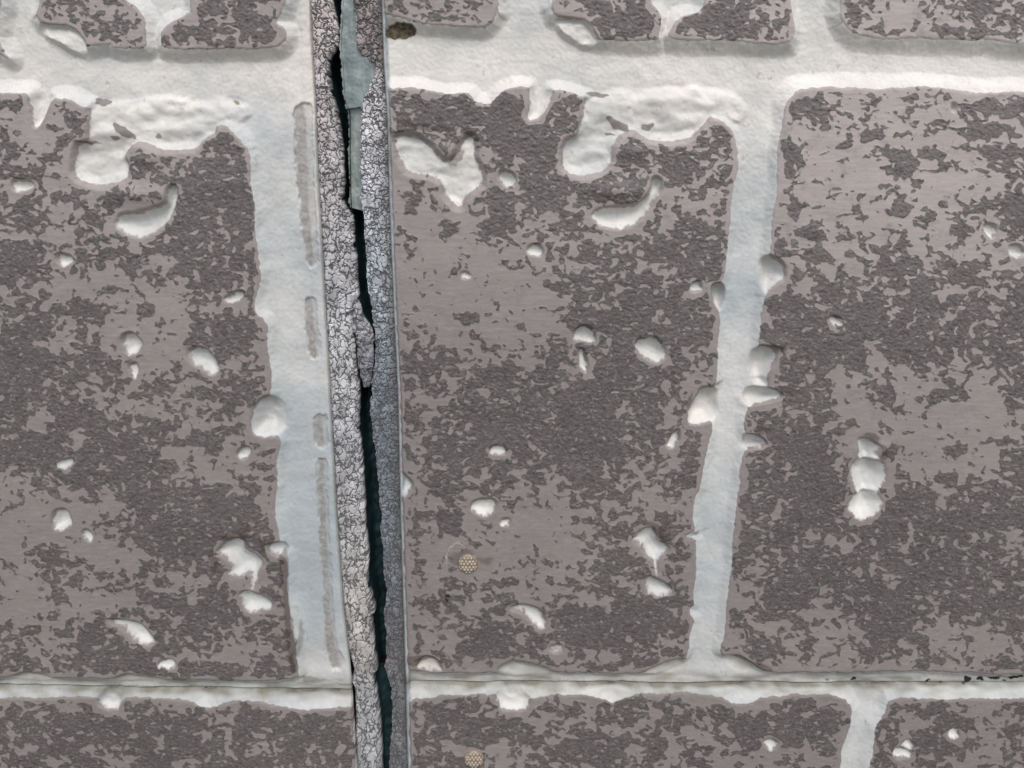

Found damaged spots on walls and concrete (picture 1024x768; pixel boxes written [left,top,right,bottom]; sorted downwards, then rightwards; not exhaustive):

spalling [111,183,182,243]
spalling [69,94,253,189]
spalling [390,131,519,211]
spalling [522,85,557,123]
spalling [587,173,665,234]
spalling [558,82,748,180]
crack [311,0,407,768]
spalling [843,435,890,524]
spalling [212,537,292,618]
spalling [629,525,675,600]
spalling [94,618,184,713]
spalling [491,603,565,714]